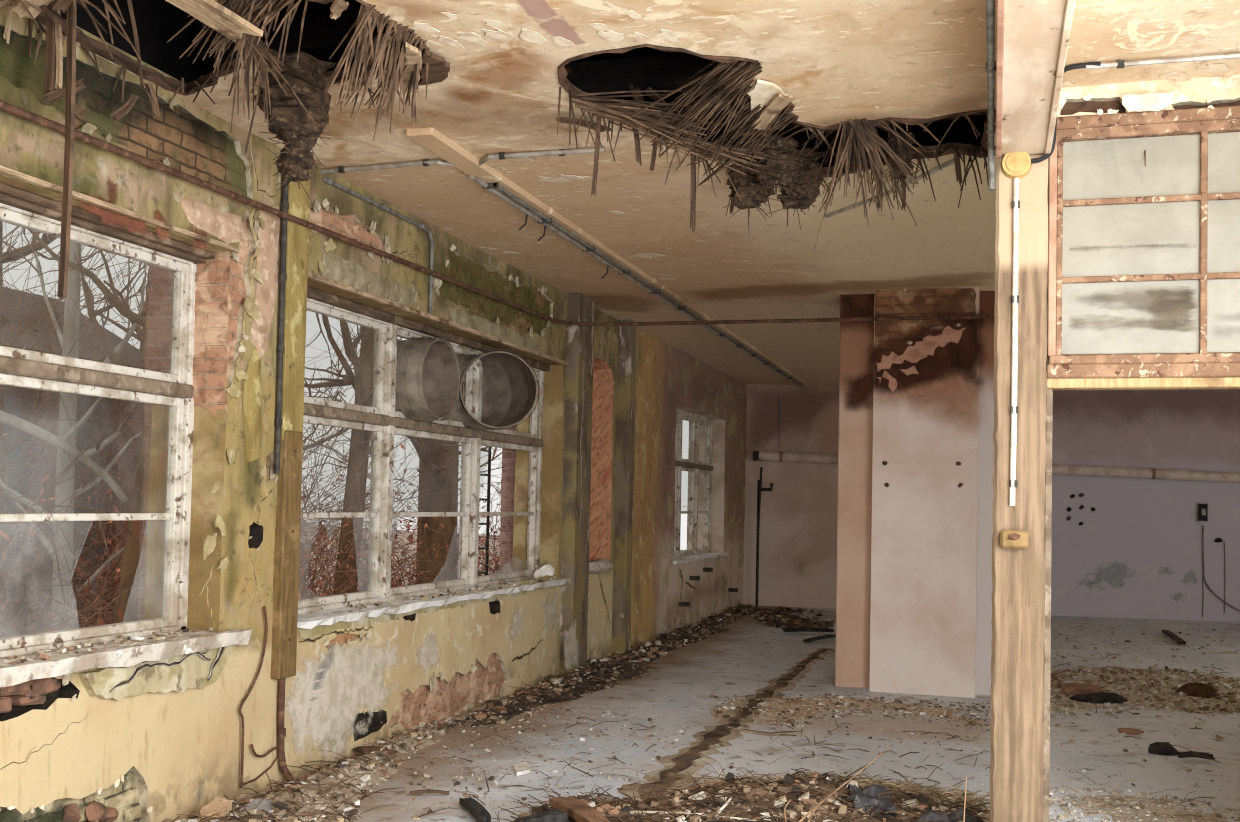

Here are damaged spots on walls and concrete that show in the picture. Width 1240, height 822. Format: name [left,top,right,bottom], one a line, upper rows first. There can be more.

damp [0,25,229,145]
flaking render [1059,81,1125,115]
flaking render [1173,98,1240,110]
peeling [538,174,593,183]
flaking render [12,77,265,420]
flaking render [875,287,976,392]
crack [109,484,274,692]
flaking render [322,633,372,648]
spalling [0,673,77,713]
flaking render [353,654,505,734]
crack [0,714,88,770]
flaking render [0,771,153,822]